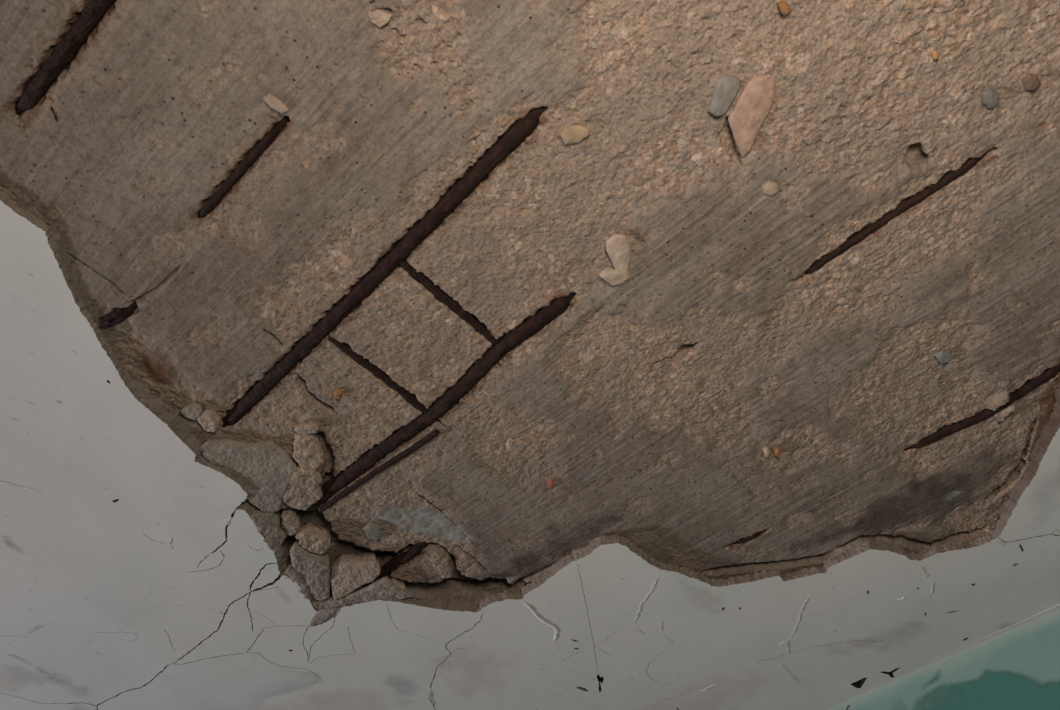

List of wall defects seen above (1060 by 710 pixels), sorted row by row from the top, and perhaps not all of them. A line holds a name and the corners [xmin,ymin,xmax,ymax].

spalling [0,0,645,584]
spalling [337,0,1060,613]
crack [4,510,356,710]
crack [387,605,483,710]
crack [416,492,476,547]
crack [999,532,1060,543]